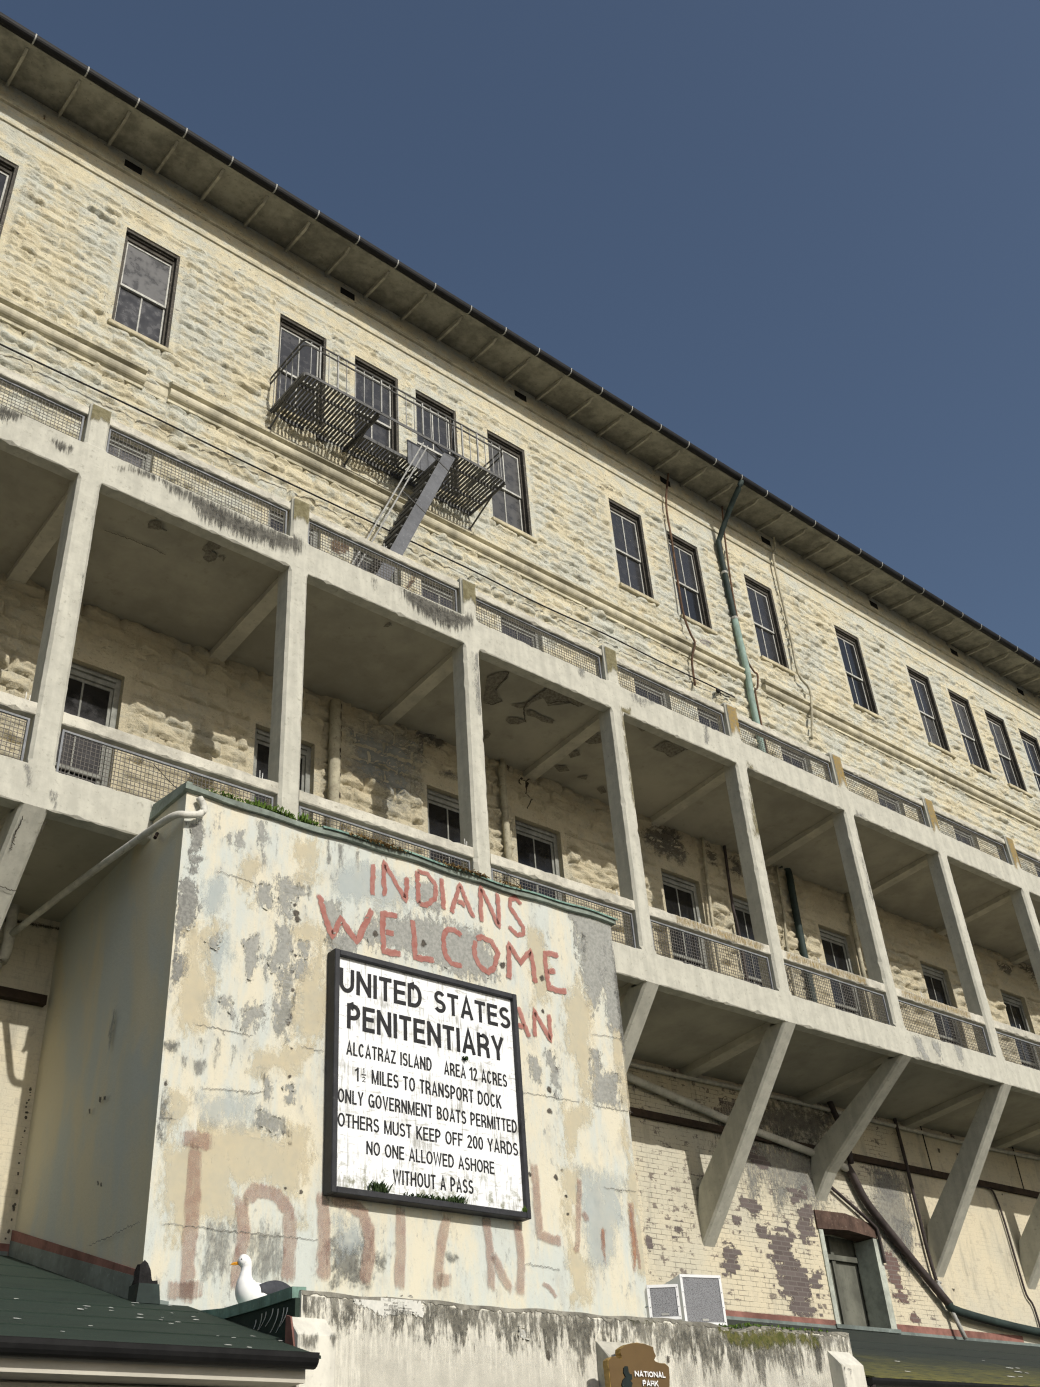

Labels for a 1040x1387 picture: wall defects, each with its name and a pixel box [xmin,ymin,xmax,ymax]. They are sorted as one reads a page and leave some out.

damp [0,405,22,422]
damp [124,466,302,552]
spalling [483,672,584,724]
peeling [164,819,501,1248]
flaking render [715,1094,736,1116]
flaking render [748,1143,771,1174]
flaking render [720,1185,825,1317]
flaking render [884,1237,920,1325]
damp [500,1313,519,1351]
damp [542,1317,594,1373]